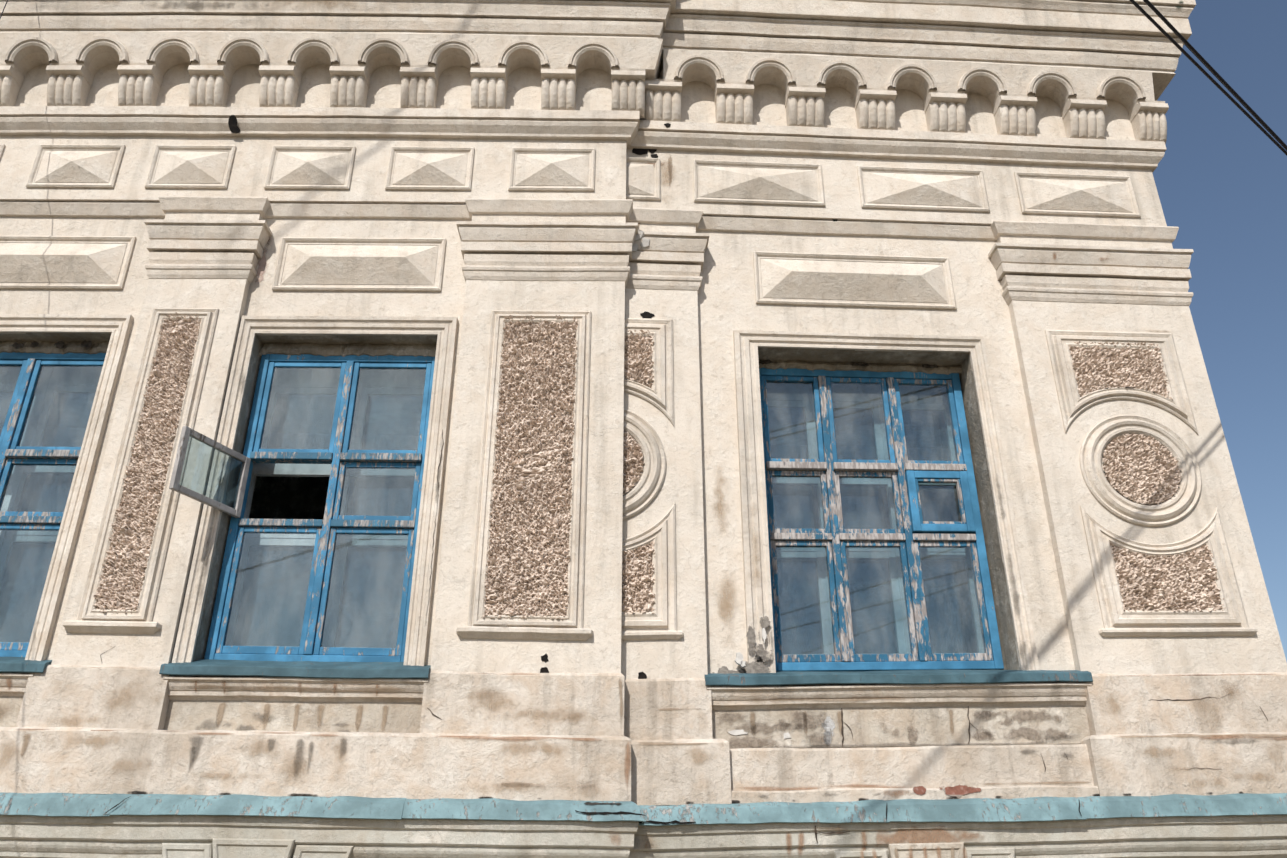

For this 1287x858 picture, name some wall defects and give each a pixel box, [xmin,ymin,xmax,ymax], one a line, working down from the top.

spalling [712,616,773,674]
crack [1151,693,1229,701]
water stain [3,734,30,762]
water stain [189,703,225,768]
water stain [239,704,269,731]
water stain [289,704,313,774]
water stain [338,706,362,753]
spalling [974,711,1066,741]
flaking render [913,785,982,798]